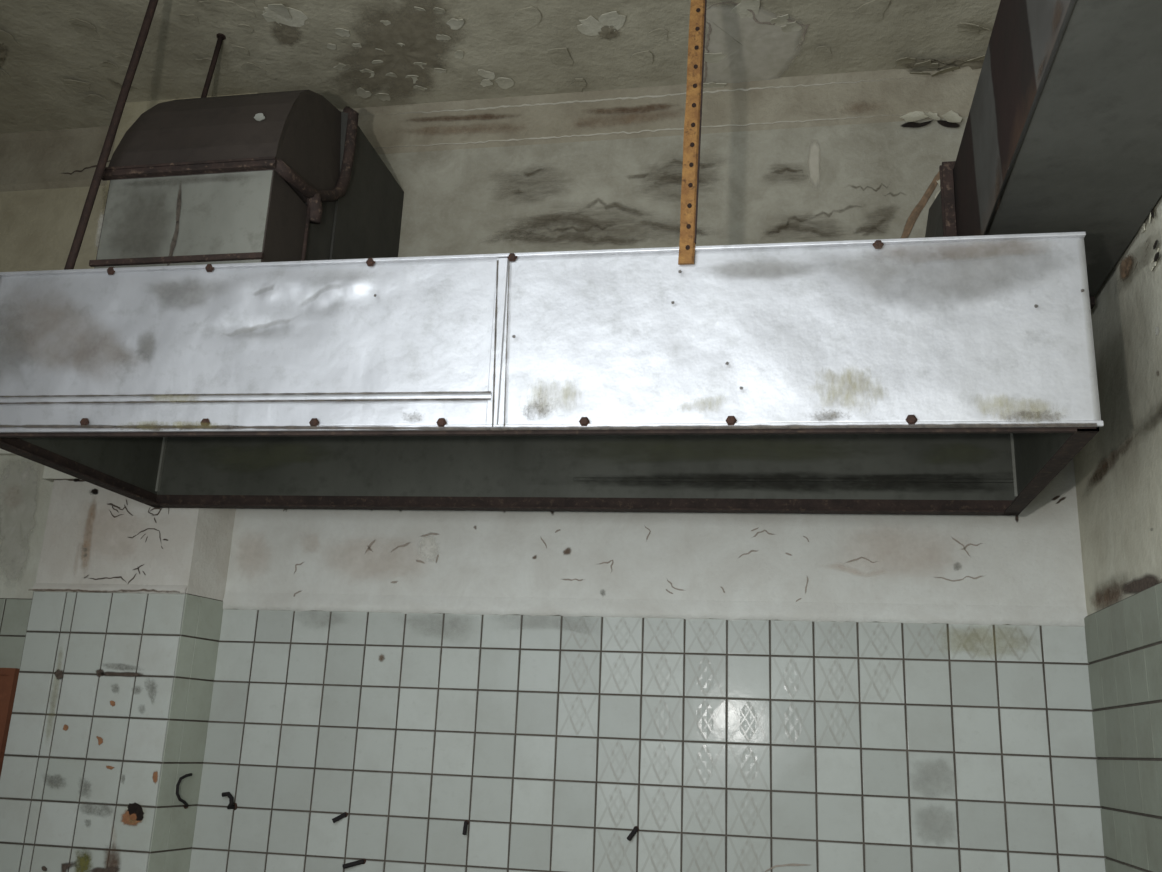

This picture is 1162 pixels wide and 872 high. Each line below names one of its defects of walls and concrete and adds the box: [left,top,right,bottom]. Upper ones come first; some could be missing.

peeling [262,4,308,44]
crack [30,500,175,592]
water stain [1096,575,1162,608]